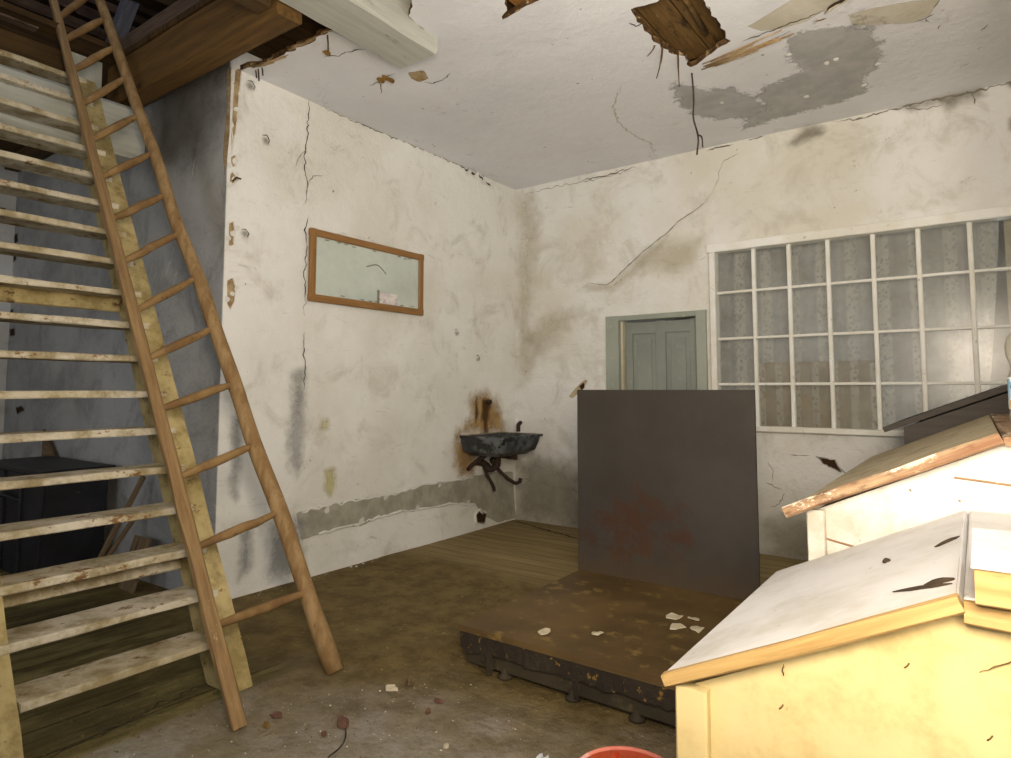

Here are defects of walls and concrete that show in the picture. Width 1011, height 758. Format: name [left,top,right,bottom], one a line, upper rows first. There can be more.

peeling [630,0,940,128]
crack [295,102,495,316]
corrosion [465,394,503,433]
corrosion [456,443,474,474]
spalling [297,472,516,540]